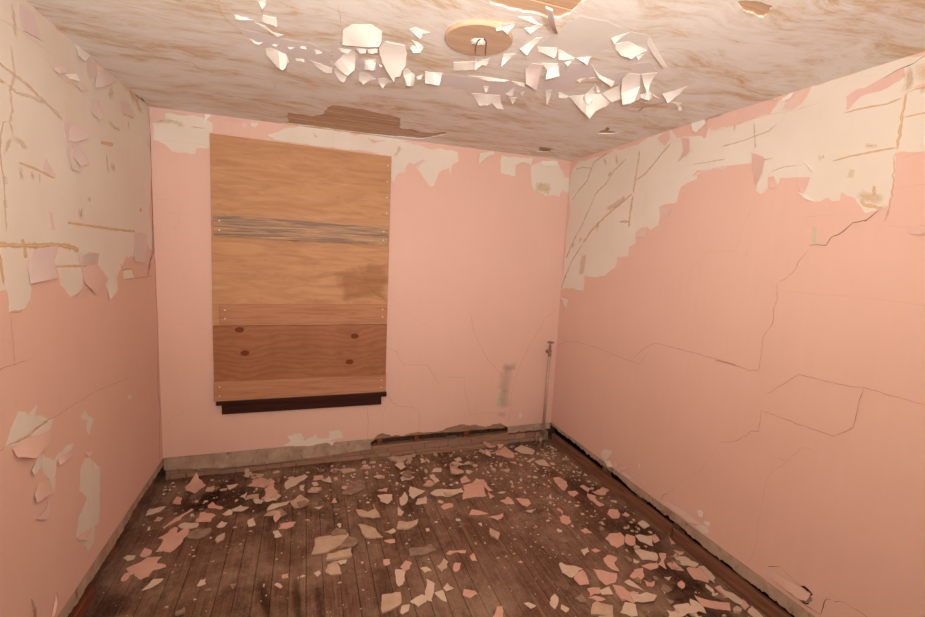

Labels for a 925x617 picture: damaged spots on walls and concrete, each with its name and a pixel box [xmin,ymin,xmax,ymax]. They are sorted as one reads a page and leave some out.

peeling [217,0,687,119]
peeling [0,0,258,313]
peeling [265,126,459,187]
peeling [500,55,925,310]
crack [558,212,906,371]
peeling [6,405,74,520]
peeling [76,450,101,551]
peeling [284,430,343,446]
crack [724,374,925,442]